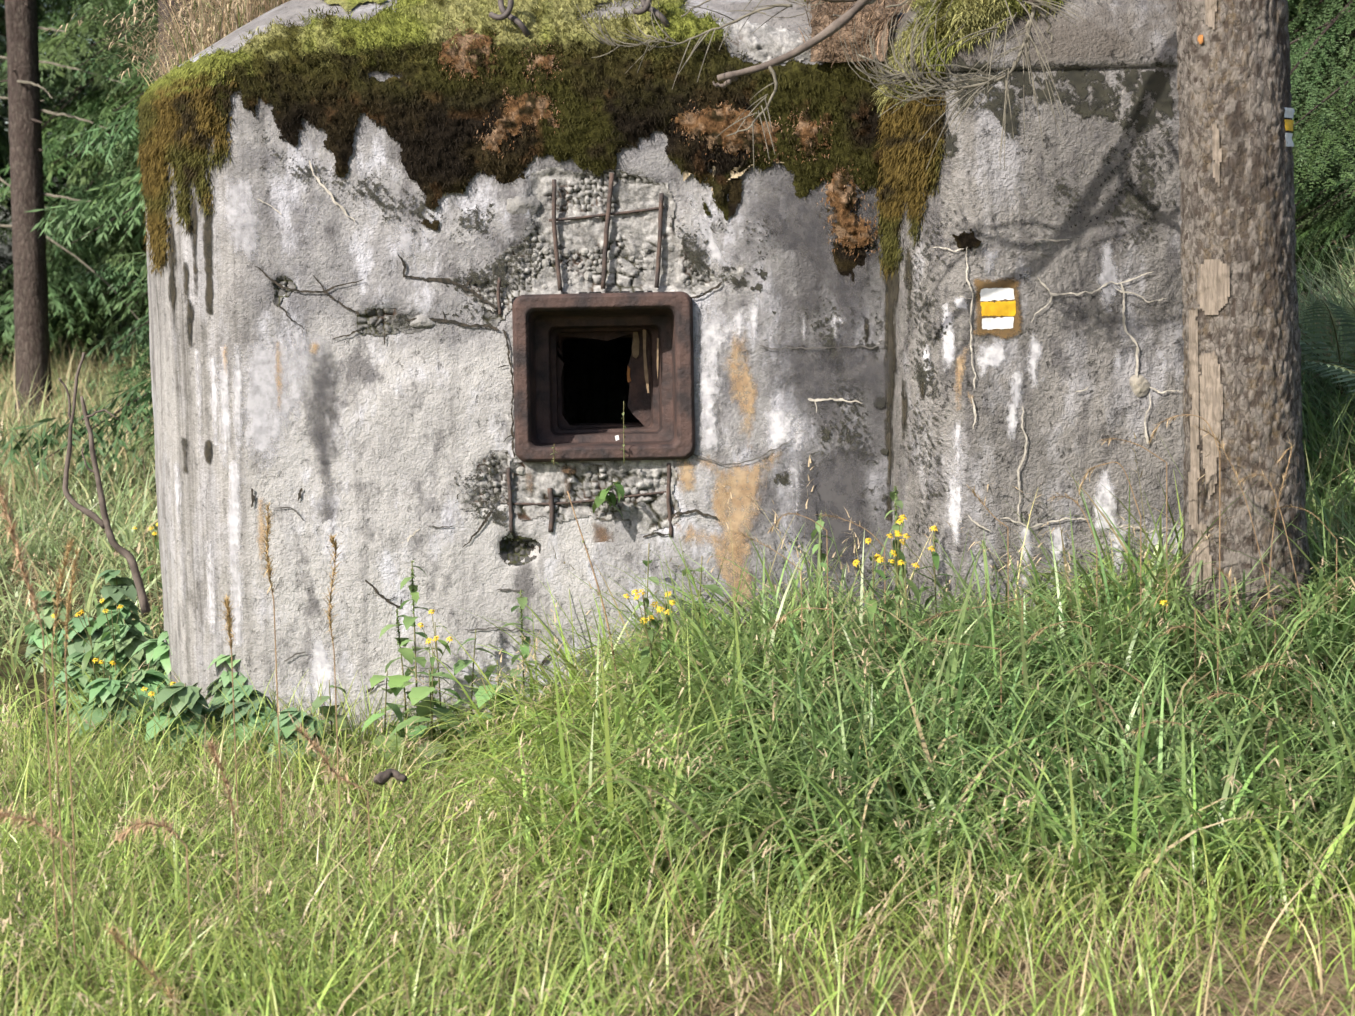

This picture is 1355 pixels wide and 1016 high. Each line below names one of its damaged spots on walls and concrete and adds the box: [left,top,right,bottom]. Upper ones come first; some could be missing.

peeling [711,164,753,194]
leakage [399,227,413,256]
spalling [448,167,750,327]
leakage [168,180,334,645]
crack [255,254,515,457]
corrosion [729,337,756,423]
leakage [977,343,1005,374]
leakage [1007,337,1041,433]
spalling [455,449,681,565]
corrosion [680,452,779,603]